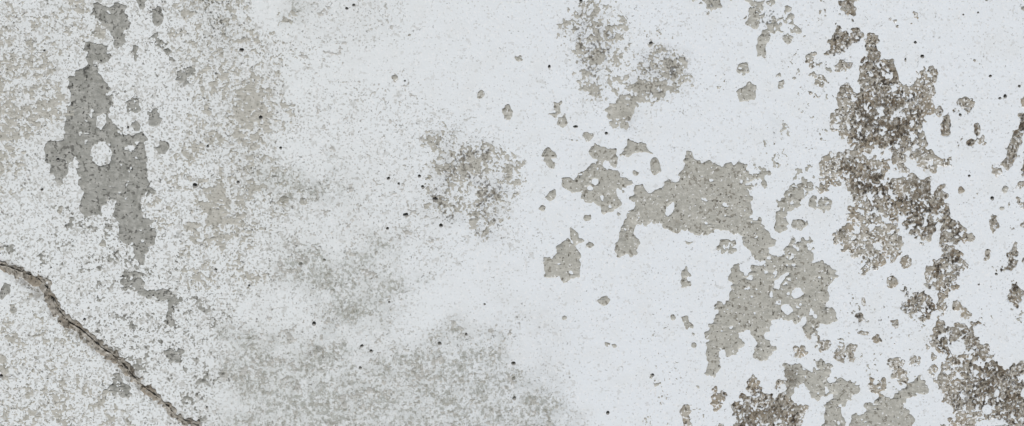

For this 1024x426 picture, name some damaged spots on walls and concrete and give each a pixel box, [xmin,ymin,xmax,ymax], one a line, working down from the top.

crack [0,260,202,426]
peeling [0,0,561,426]
peeling [539,0,1024,426]